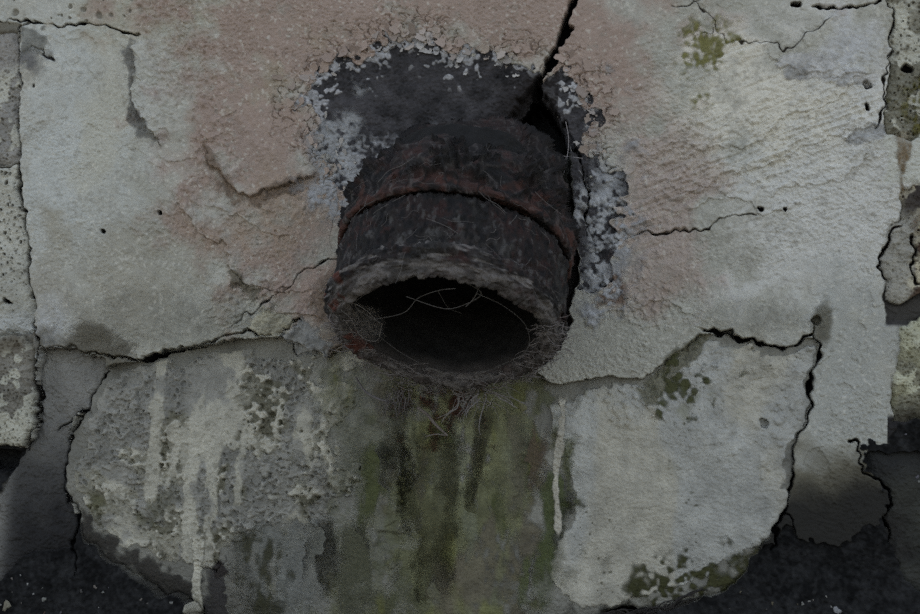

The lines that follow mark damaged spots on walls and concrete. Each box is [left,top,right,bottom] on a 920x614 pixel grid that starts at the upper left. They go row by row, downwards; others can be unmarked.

spalling [123,46,159,142]
peeling [203,15,628,293]
crack [627,213,755,239]
crack [671,0,894,125]
crack [129,259,344,363]
crack [29,336,110,575]
damp [521,444,574,594]
peeling [549,334,816,608]
crack [703,328,822,543]